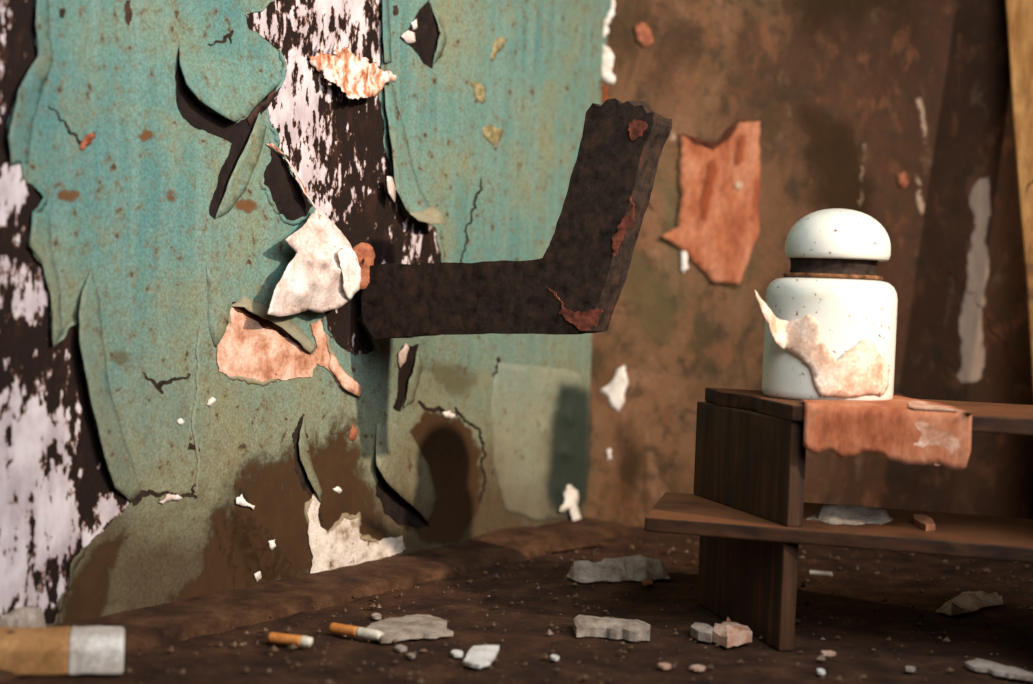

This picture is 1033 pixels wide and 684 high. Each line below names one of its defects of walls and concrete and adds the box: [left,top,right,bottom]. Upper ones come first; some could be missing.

peeling [175,0,447,398]
crack [460,178,483,263]
corrosion [701,157,718,220]
peeling [0,0,141,627]
crack [143,372,191,394]
peeling [298,343,438,573]
crack [418,400,487,501]